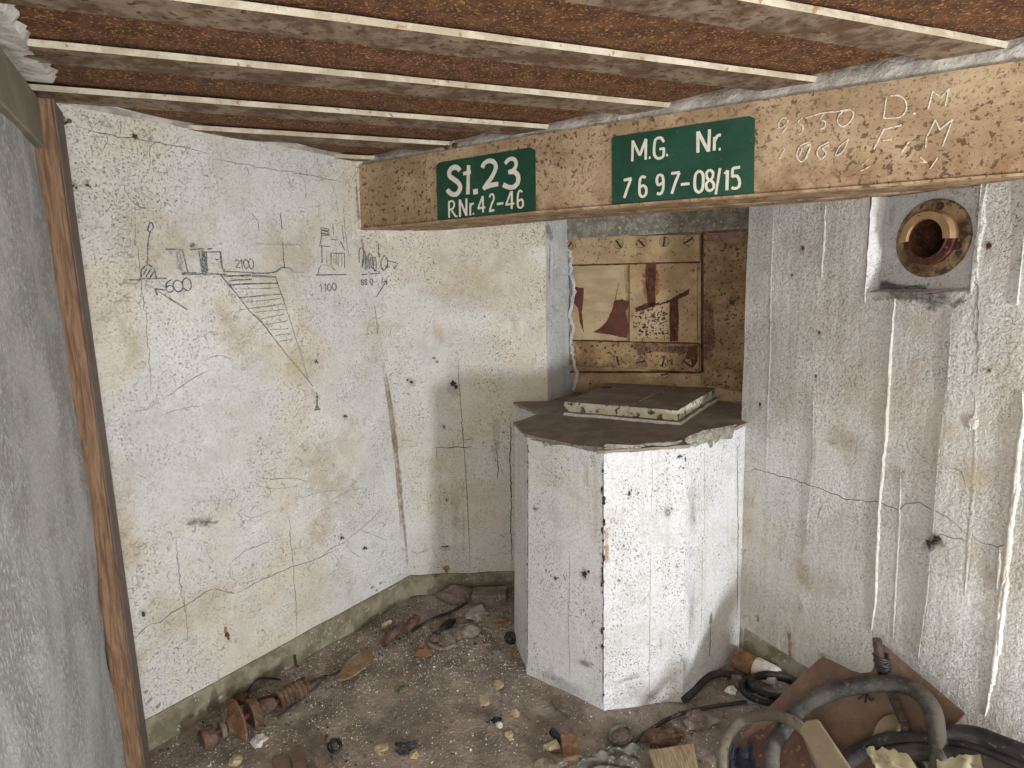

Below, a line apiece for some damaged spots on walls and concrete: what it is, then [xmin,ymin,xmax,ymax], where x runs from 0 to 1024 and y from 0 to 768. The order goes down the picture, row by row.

rust [633,264,698,368]
crack [134,477,385,639]
spalling [526,424,737,698]
crack [737,460,1005,608]